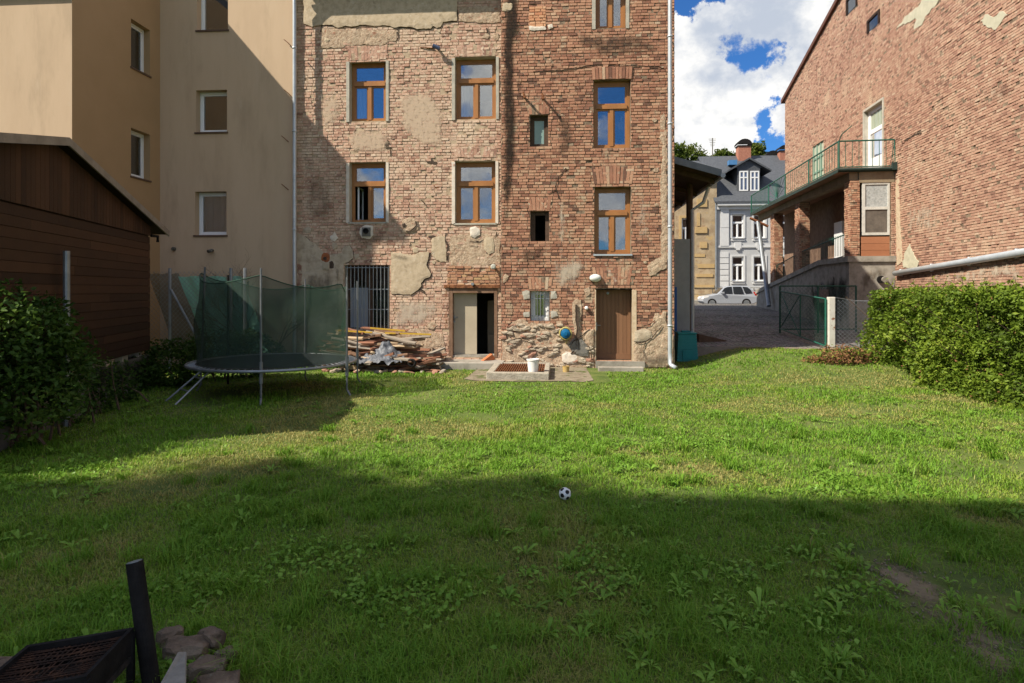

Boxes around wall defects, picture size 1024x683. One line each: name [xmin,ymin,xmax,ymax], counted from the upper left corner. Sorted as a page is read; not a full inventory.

crack [320,10,458,41]
peeling [897,0,939,30]
peeling [981,11,1008,30]
peeling [896,178,919,268]
peeling [391,217,509,294]
spalling [486,291,595,380]
peeling [633,311,675,367]